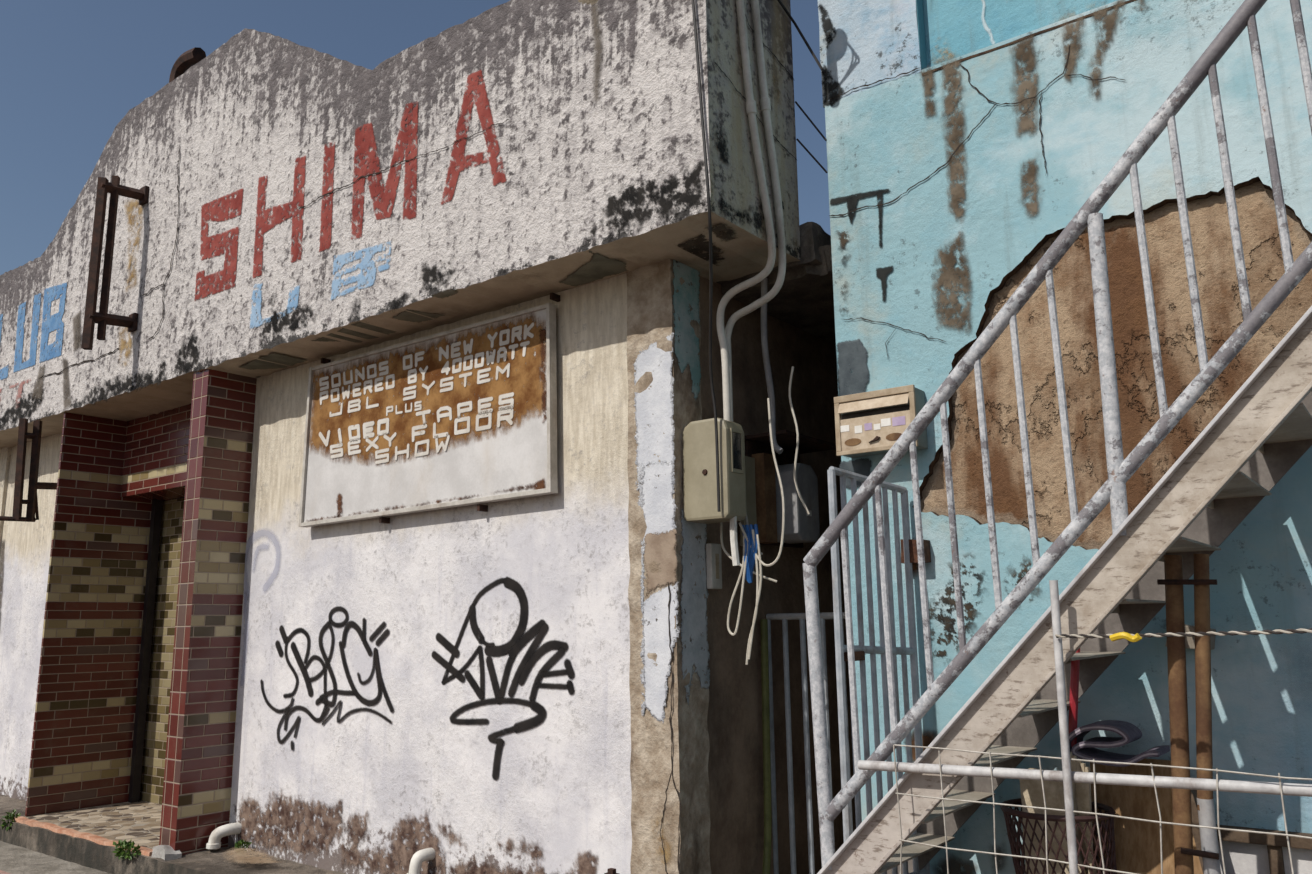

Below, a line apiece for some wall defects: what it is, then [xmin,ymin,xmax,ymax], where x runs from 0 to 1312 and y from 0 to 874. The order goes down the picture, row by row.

crack [982,0,995,44]
crack [828,45,1124,216]
leakage [586,160,764,240]
leakage [0,367,44,429]
leakage [63,312,199,408]
leakage [259,298,315,339]
leakage [391,260,455,309]
crack [844,317,946,357]
spalling [920,226,1112,550]
spalling [1104,181,1312,516]
peeling [634,225,736,723]
leakage [929,563,983,658]